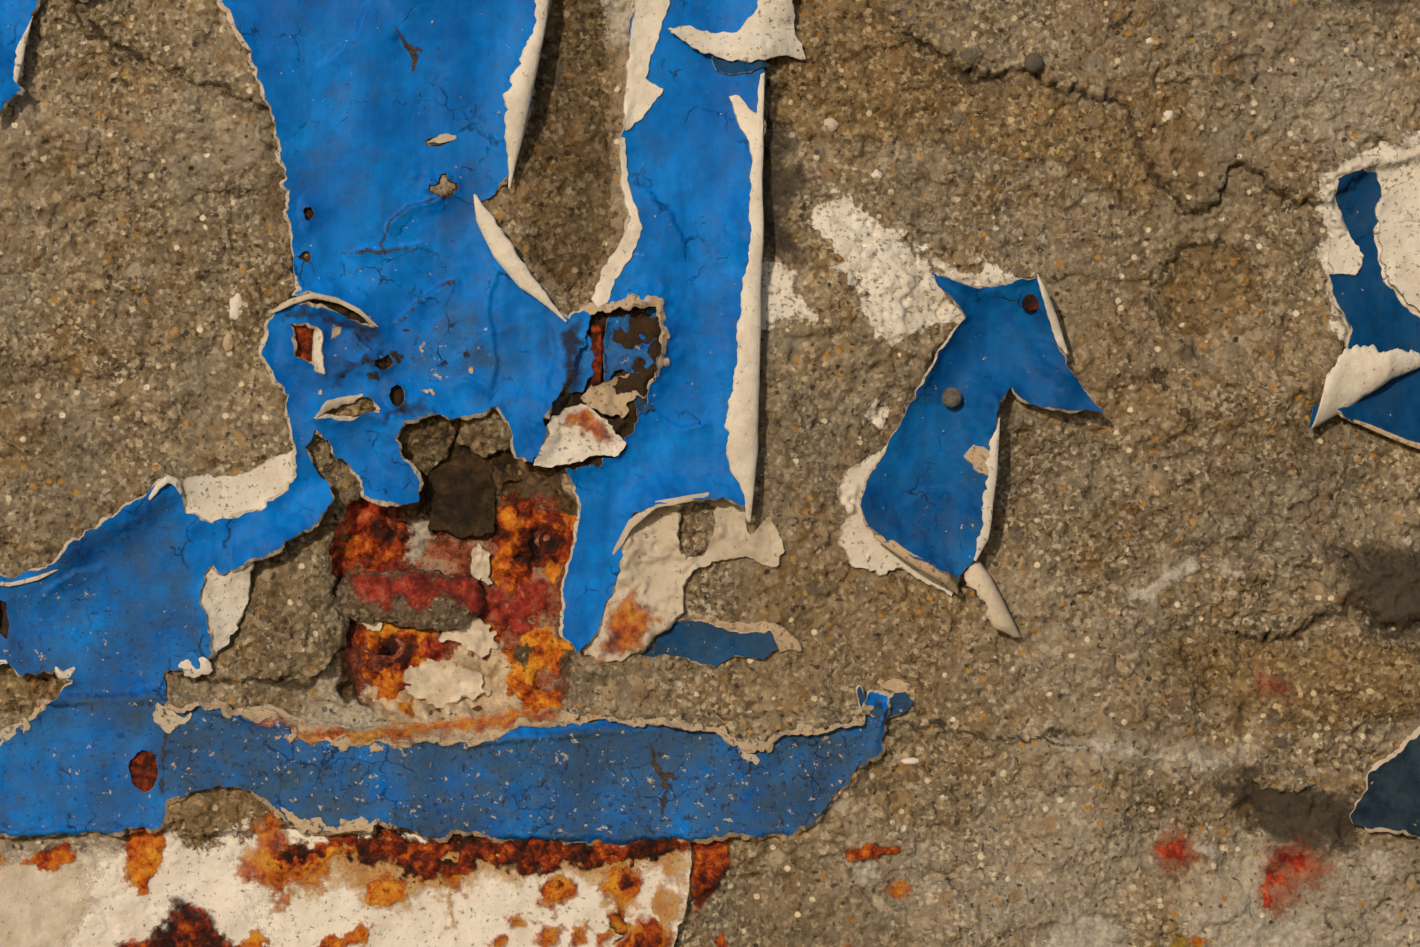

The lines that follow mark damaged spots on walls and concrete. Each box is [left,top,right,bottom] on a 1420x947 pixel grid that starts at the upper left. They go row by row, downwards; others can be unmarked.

crack [70,3,269,109]
crack [901,31,1316,329]
peeling [1310,130,1420,450]
peeling [0,0,1169,851]
crack [1153,369,1197,447]
rust [263,491,577,742]
spalling [1155,616,1420,842]
rust [123,822,166,896]
rust [115,896,269,947]
rust [237,811,733,947]